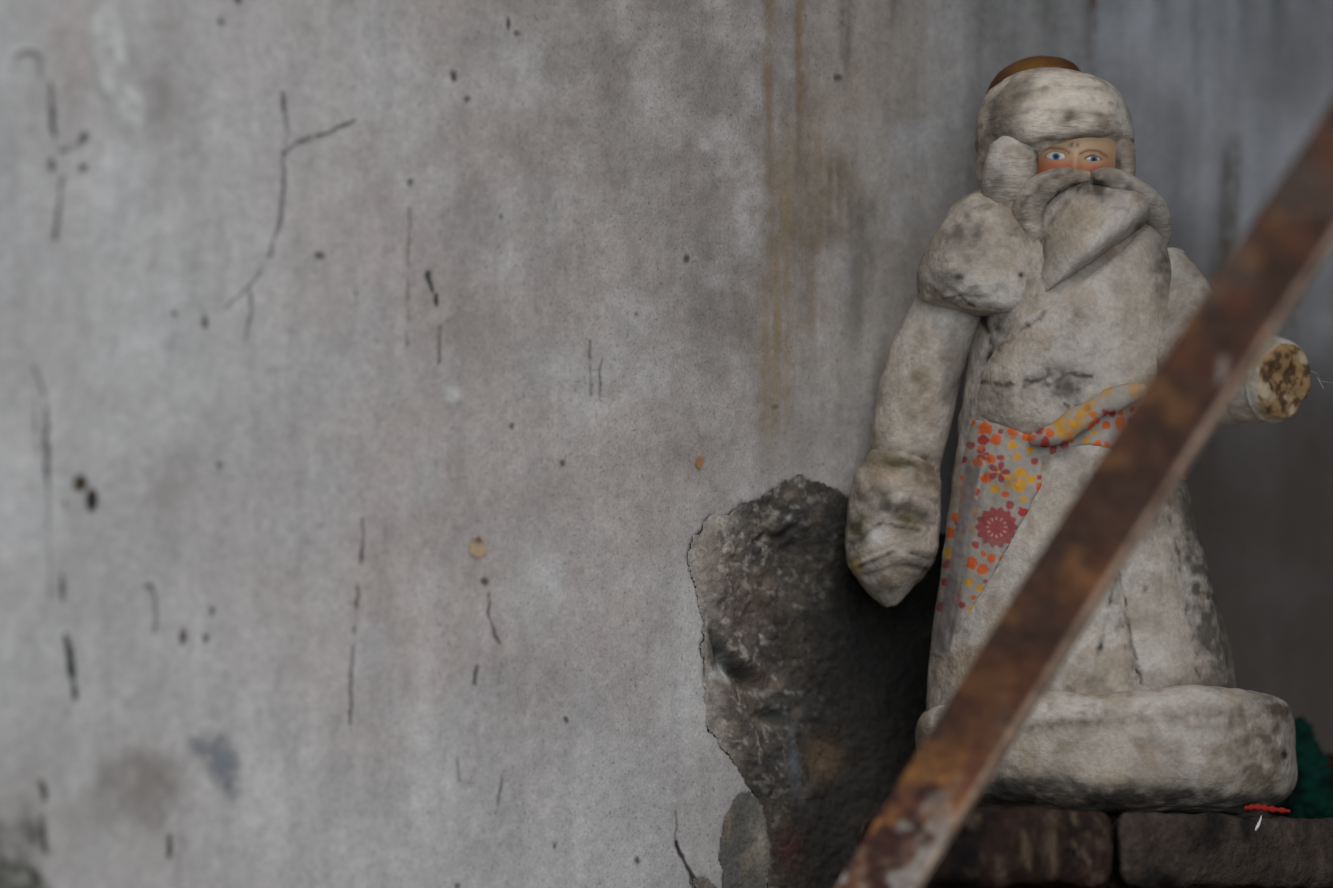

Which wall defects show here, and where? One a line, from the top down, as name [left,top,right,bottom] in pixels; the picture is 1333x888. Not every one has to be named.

crack [289,119,355,149]